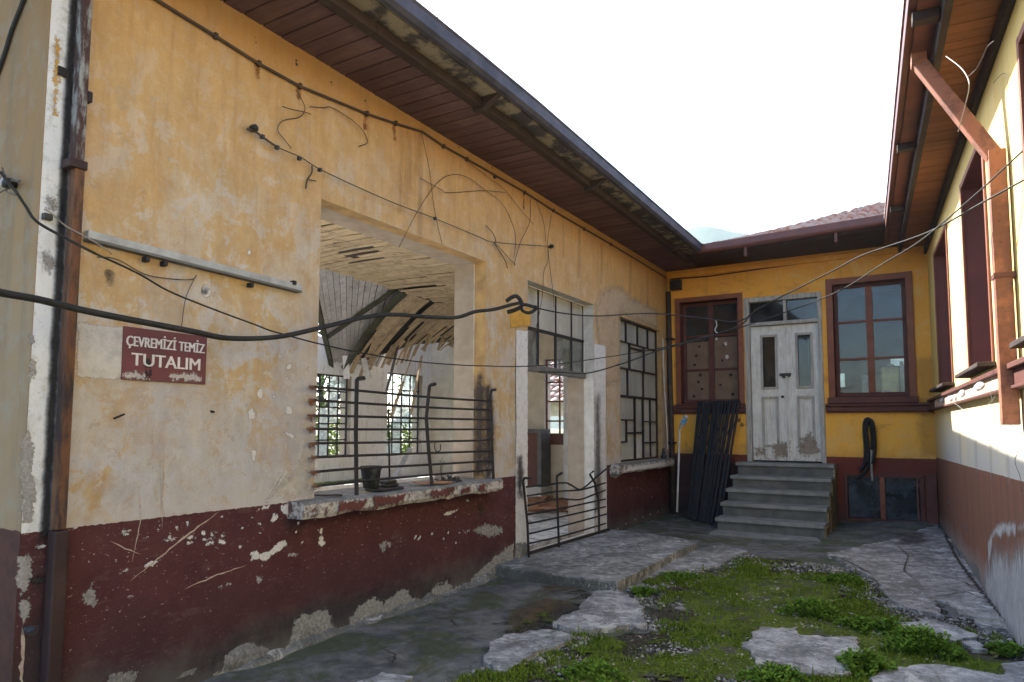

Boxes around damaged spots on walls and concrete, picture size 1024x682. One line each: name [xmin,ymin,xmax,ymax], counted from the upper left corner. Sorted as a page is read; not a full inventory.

peeling [754,431,821,460]
spalling [18,429,37,523]
peeling [14,544,47,623]
peeling [239,503,303,562]
peeling [337,493,406,515]
spalling [432,541,514,596]
peeling [988,520,1024,565]
spalling [285,589,421,650]